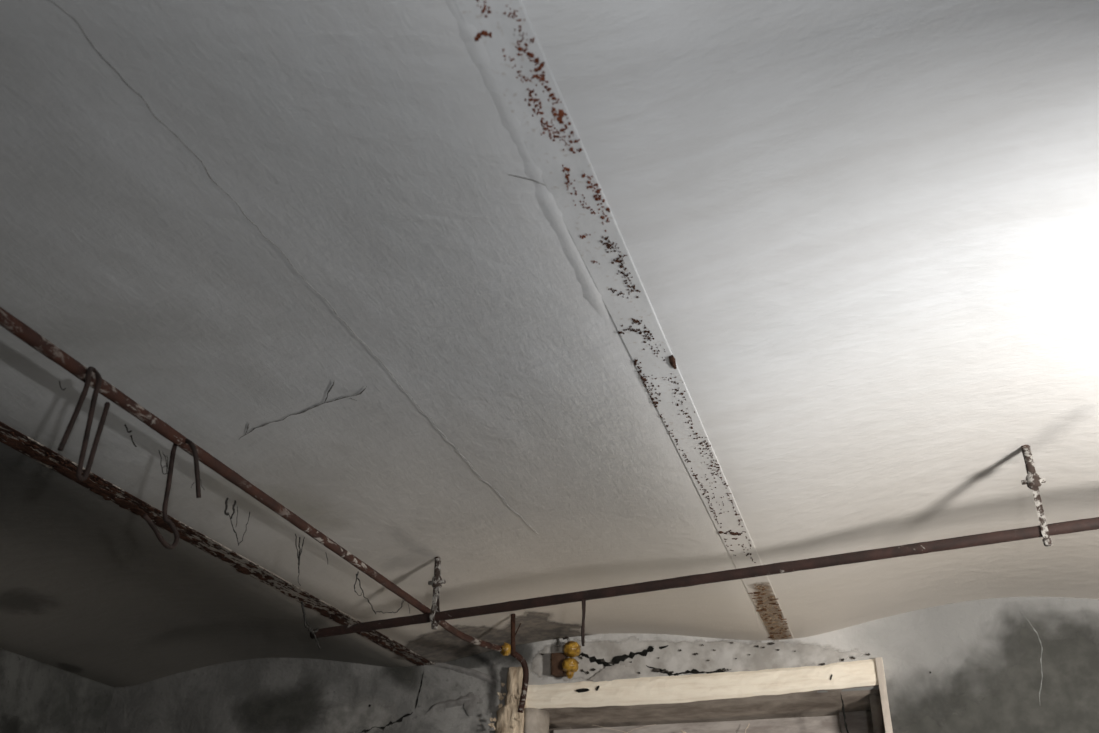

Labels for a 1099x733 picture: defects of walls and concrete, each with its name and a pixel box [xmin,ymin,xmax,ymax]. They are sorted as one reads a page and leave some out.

corrosion [474,0,492,41]
corrosion [503,5,582,153]
crack [50,0,536,532]
corrosion [562,165,640,299]
corrosion [618,318,756,563]
corrosion [0,425,428,665]
crack [577,645,732,676]
corrosion [748,584,791,640]
leakage [891,618,1099,733]